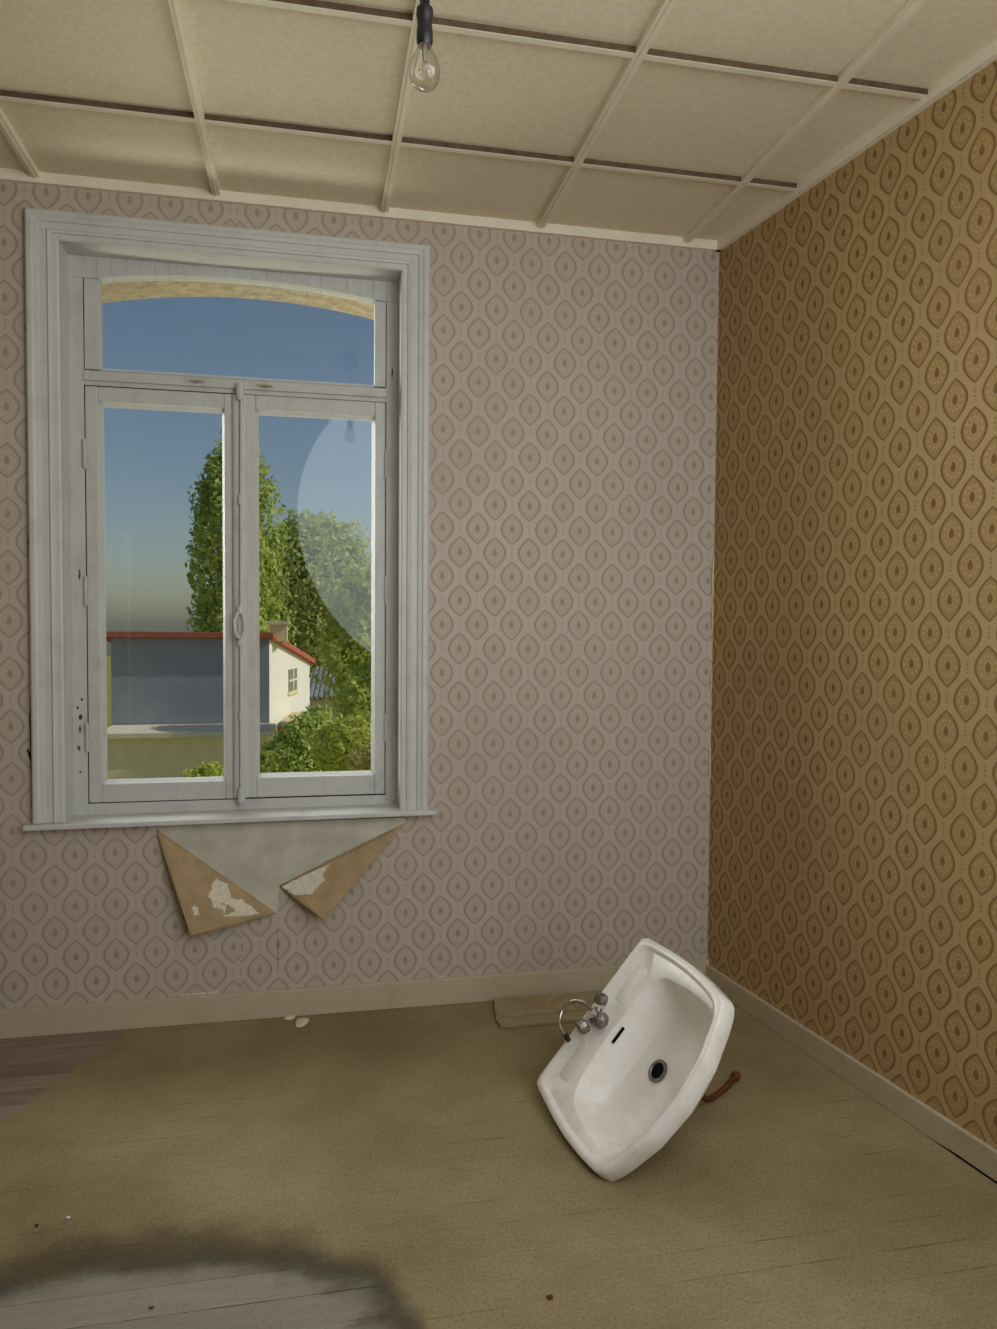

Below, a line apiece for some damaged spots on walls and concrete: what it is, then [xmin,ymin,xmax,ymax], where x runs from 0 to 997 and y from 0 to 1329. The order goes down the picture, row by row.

flaking render [150,817,406,917]